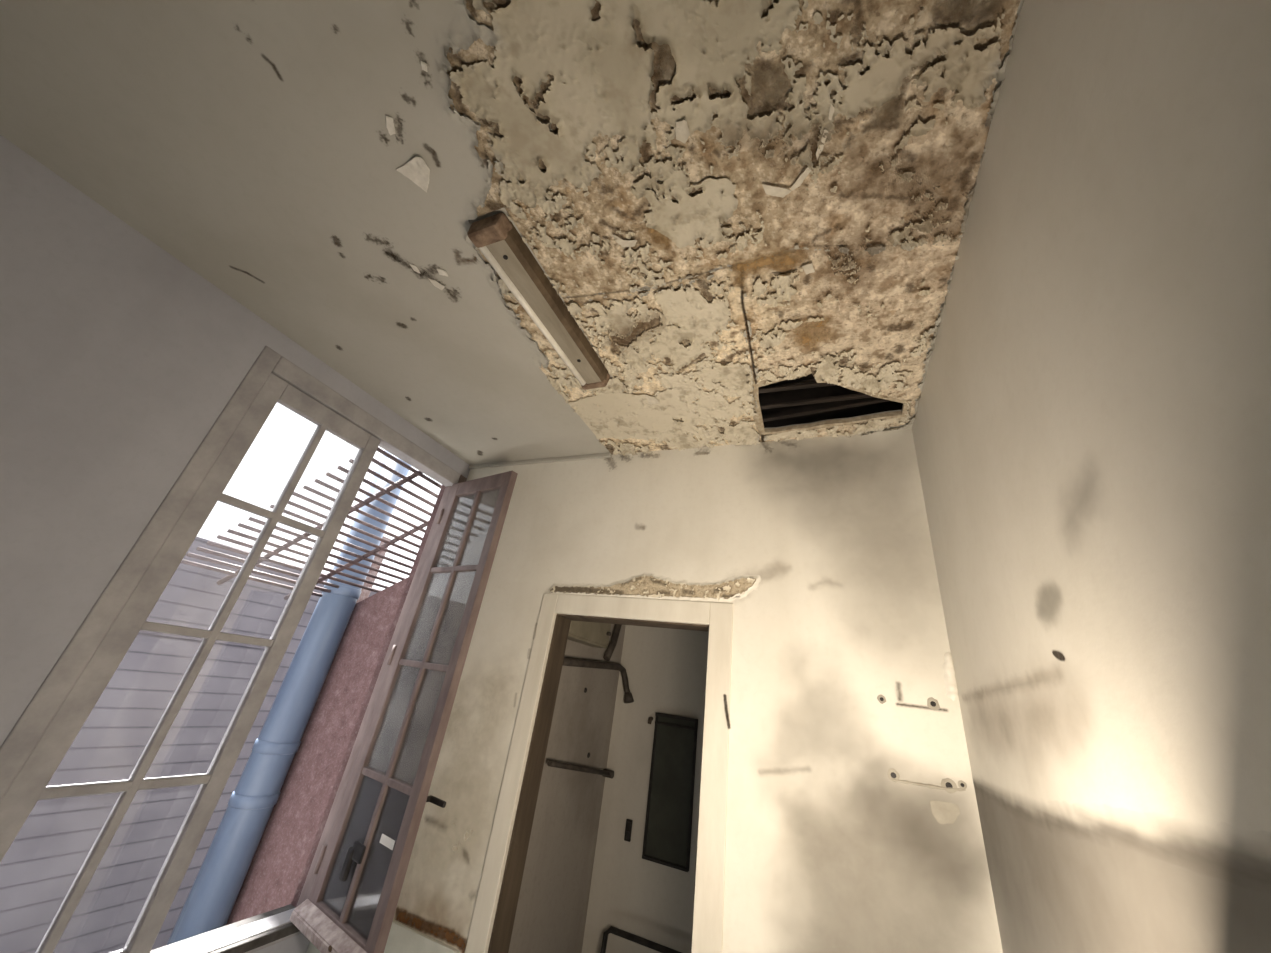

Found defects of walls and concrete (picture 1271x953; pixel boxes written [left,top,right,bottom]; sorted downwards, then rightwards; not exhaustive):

spalling [381,116,403,144]
peeling [396,146,440,192]
peeling [420,0,1024,456]
spalling [367,235,459,301]
flaking render [547,571,762,603]